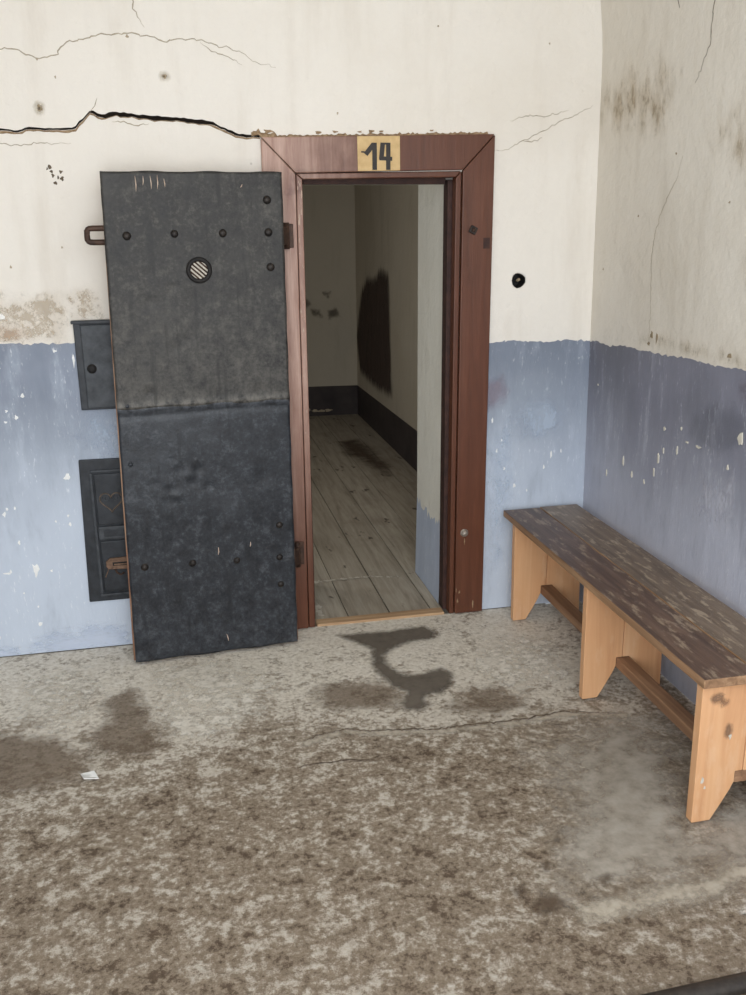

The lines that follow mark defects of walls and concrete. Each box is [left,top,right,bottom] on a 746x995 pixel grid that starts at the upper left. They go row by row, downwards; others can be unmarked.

crack [0,0,276,68]
crack [0,99,260,146]
crack [498,106,592,151]
flaking render [0,299,62,339]
water stain [325,627,451,709]
water stain [94,691,163,755]
water stain [0,736,83,790]